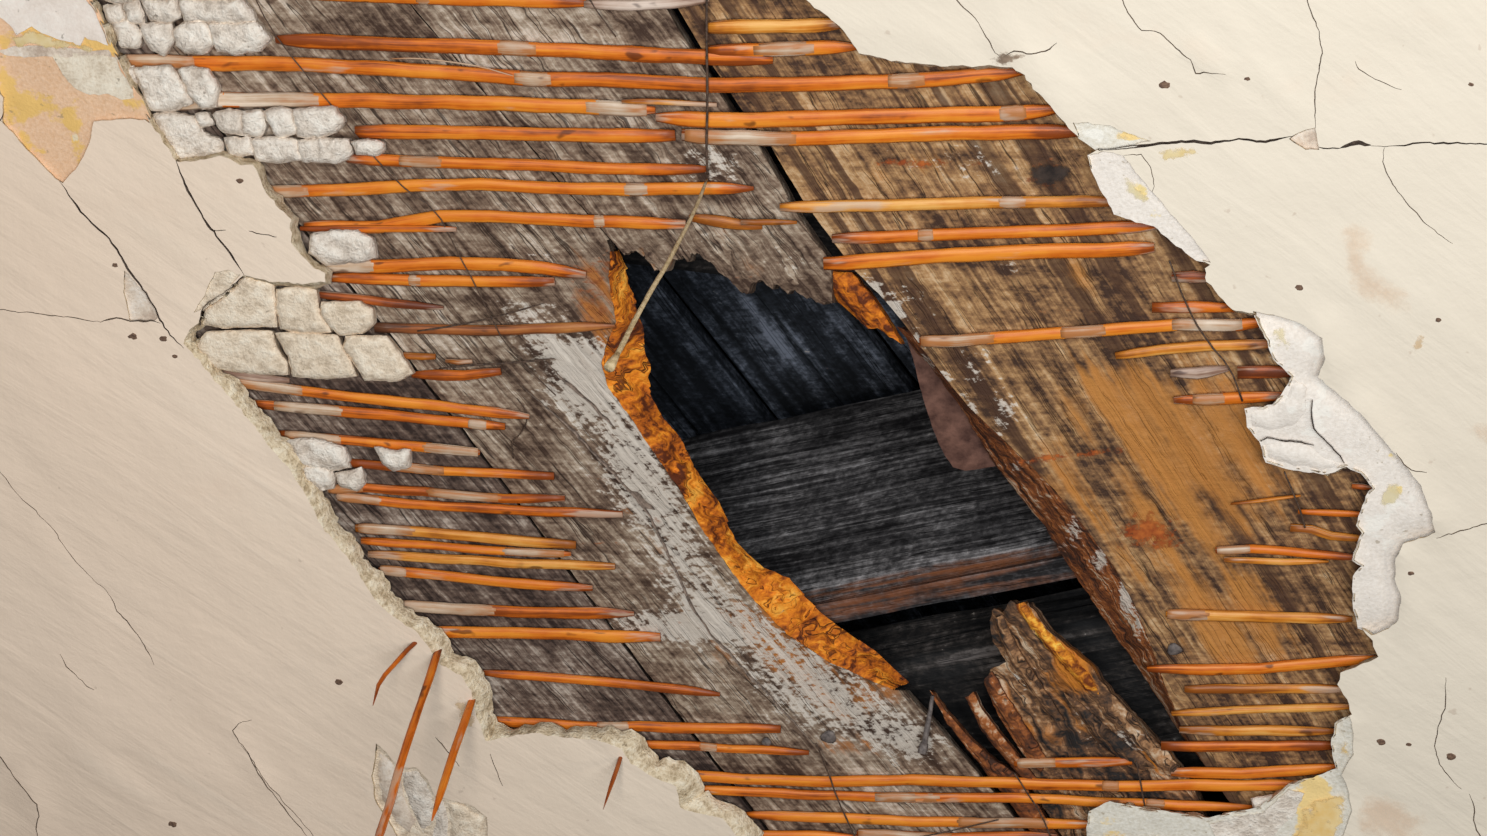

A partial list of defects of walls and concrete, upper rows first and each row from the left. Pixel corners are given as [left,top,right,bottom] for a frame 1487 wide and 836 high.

flaking render [0,0,152,182]
crack [0,161,274,346]
flaking render [195,270,243,312]
crack [956,0,1055,55]
flaking render [1074,122,1210,262]
crack [1100,0,1487,244]
flaking render [1291,128,1319,149]
flaking render [1245,312,1435,634]
crack [0,472,154,664]
flaking render [373,745,488,836]
flaking render [1086,717,1354,836]